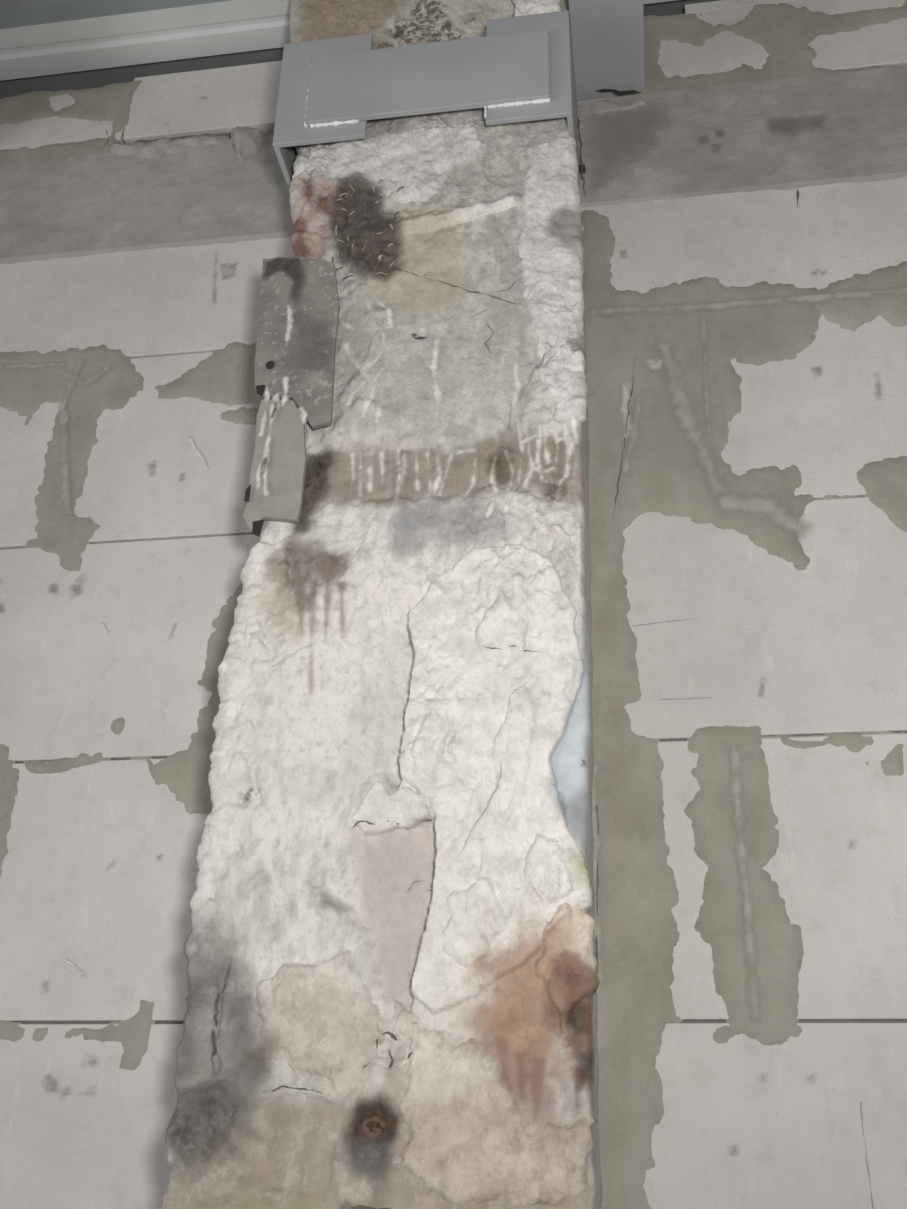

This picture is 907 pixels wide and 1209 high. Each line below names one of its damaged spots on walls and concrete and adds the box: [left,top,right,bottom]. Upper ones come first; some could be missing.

water stain [186,950,259,1088]
corrosion [488,943,600,1120]
corrosion [350,1100,397,1172]